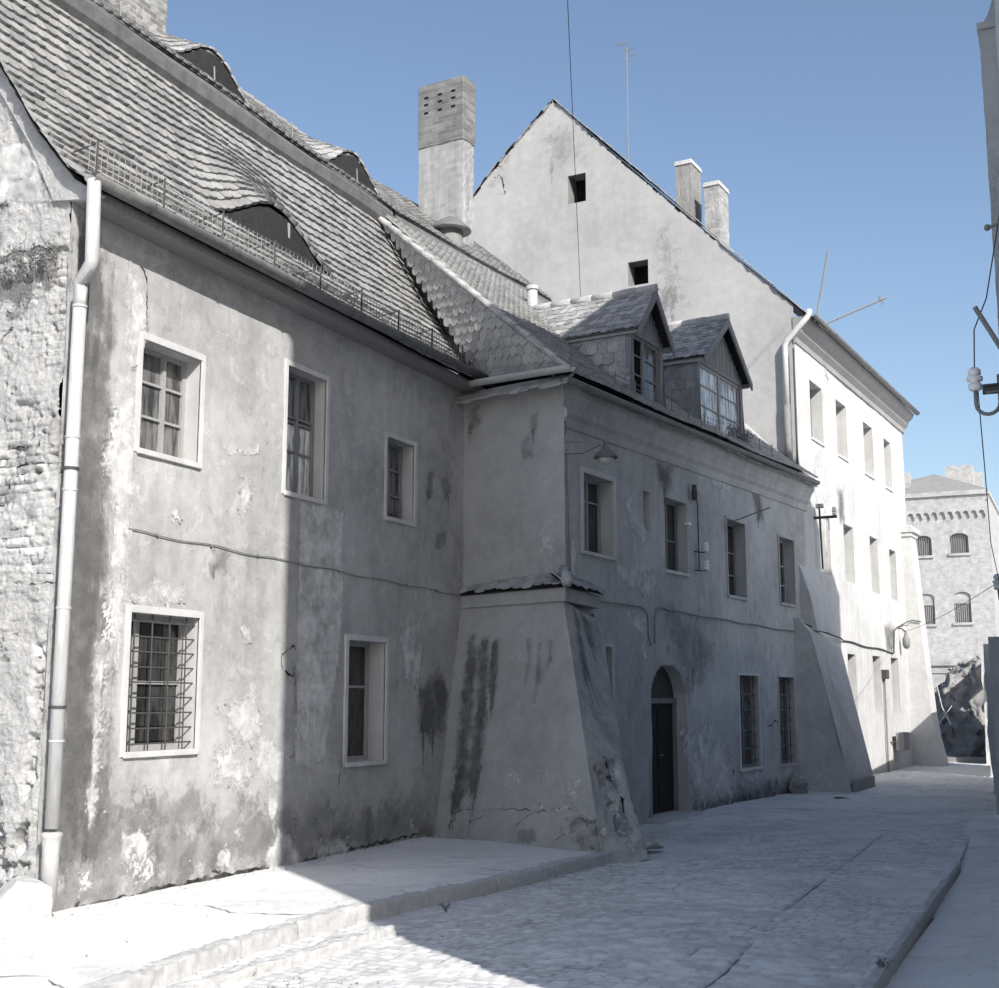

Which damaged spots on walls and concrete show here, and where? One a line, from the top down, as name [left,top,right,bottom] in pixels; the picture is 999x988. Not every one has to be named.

crack [0,245,68,258]
flaking render [0,434,52,590]
crack [0,440,63,541]
spalling [0,637,55,888]
water stain [419,674,448,756]
water stain [449,638,498,827]
crack [446,803,581,826]
flaking render [564,746,641,853]
crack [75,832,427,907]